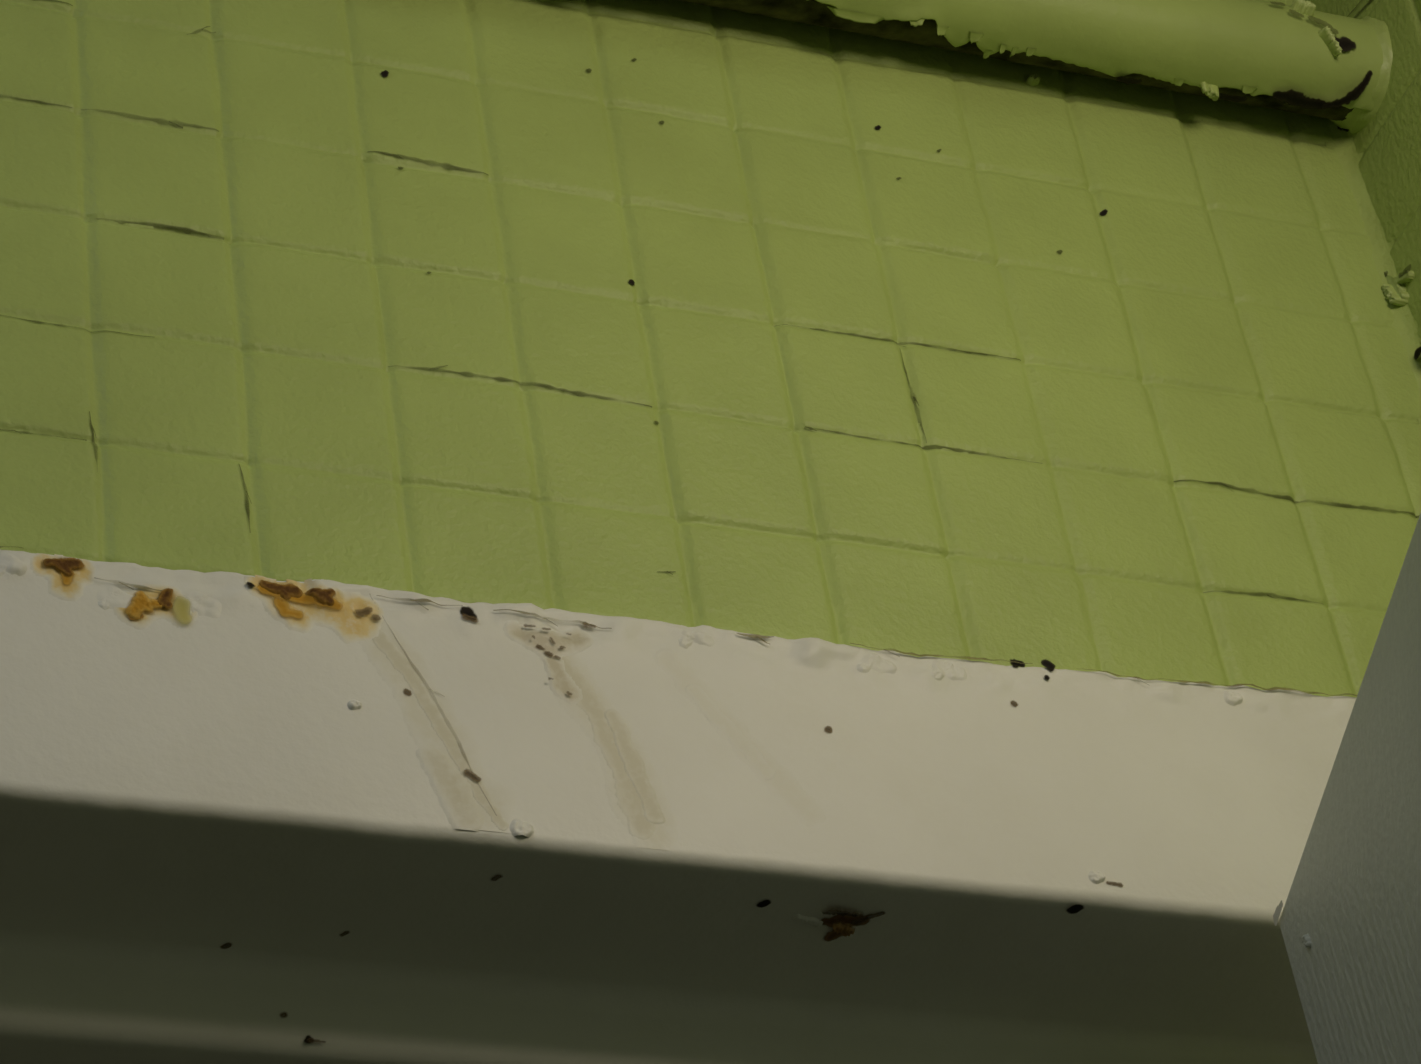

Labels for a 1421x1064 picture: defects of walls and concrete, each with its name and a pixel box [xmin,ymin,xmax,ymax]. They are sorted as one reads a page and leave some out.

peeling [827,6,884,24]
peeling [910,19,949,36]
peeling [970,32,1037,59]
spalling [1271,0,1356,57]
spalling [1173,70,1373,109]
rust [30,553,99,601]
rust [113,583,198,630]
rust [243,575,384,644]